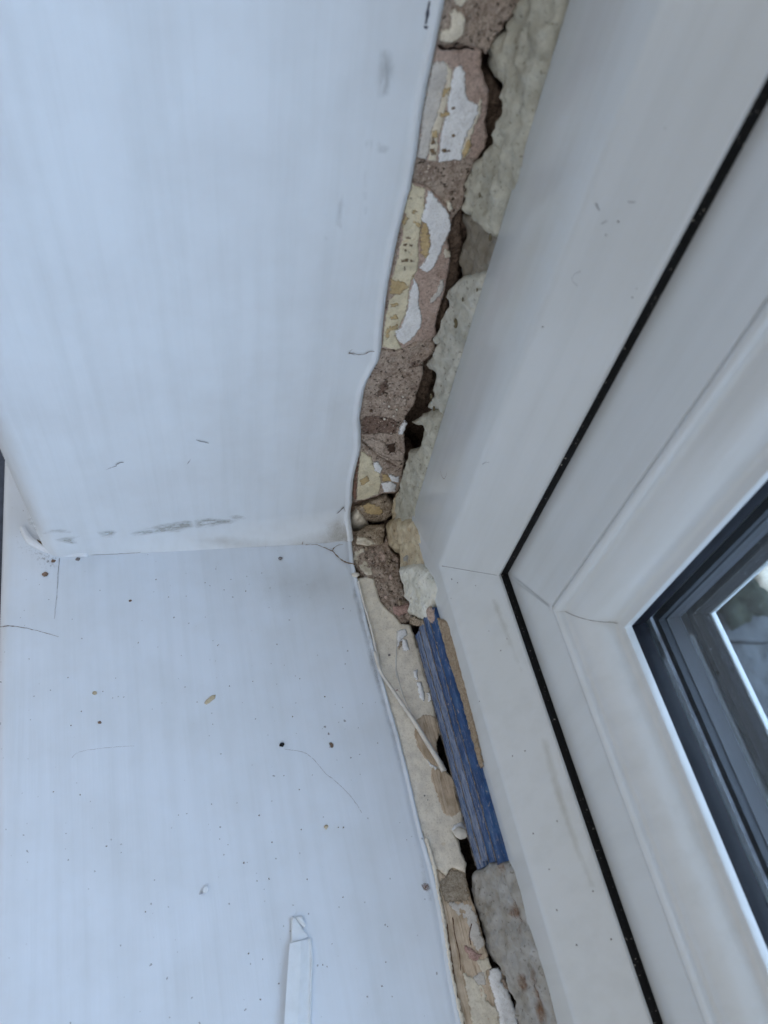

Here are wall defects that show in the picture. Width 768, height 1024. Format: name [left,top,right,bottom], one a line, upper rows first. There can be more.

peeling [352,0,519,502]
peeling [352,531,519,1024]